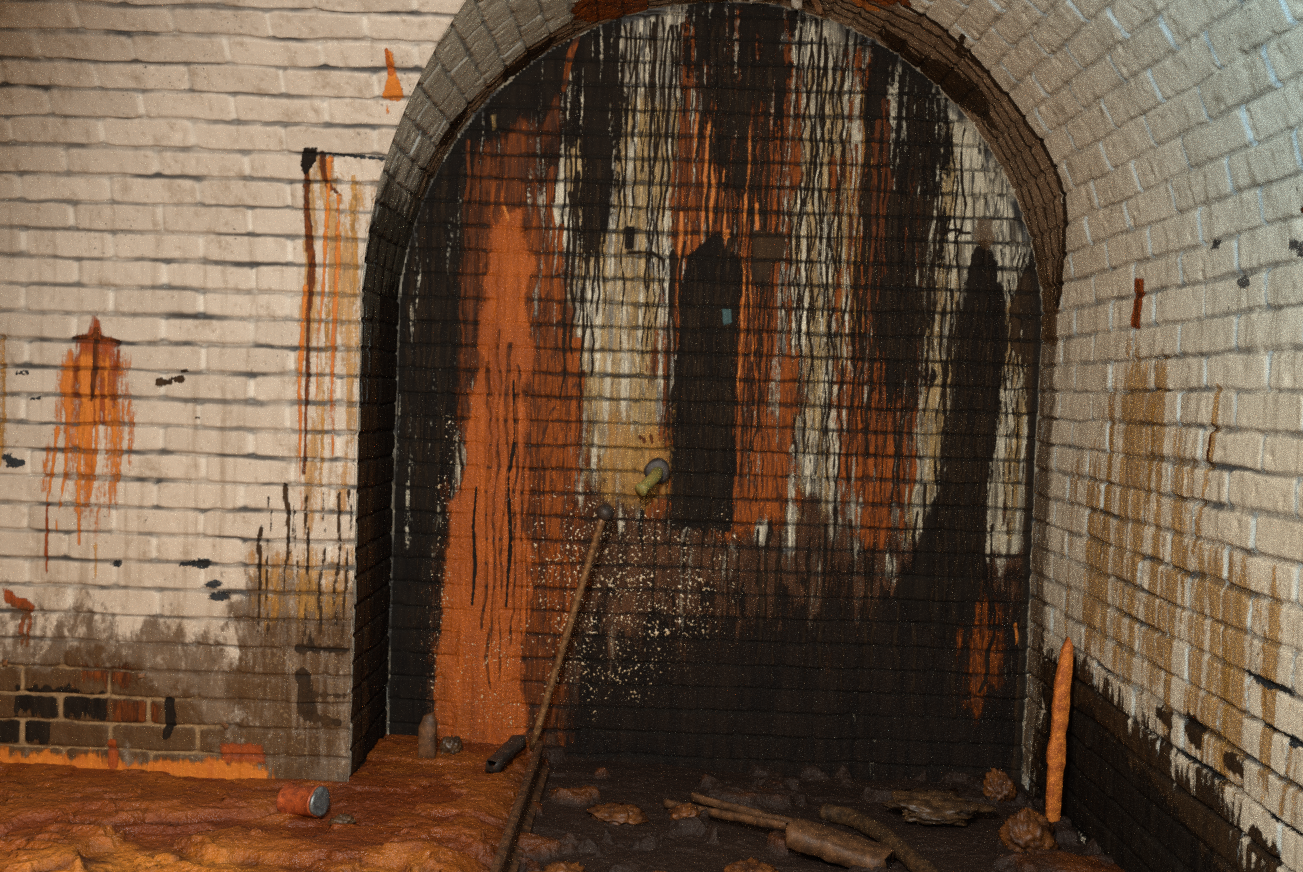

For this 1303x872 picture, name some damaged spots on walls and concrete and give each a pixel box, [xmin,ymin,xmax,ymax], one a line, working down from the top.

corrosion [43,316,135,576]
corrosion [296,147,385,531]
corrosion [382,48,404,112]
corrosion [428,0,809,746]
leakage [179,2,1061,808]
corrosion [828,46,929,552]
corrosion [952,222,1057,781]
leakage [1060,647,1283,872]
corrosion [1064,278,1301,826]
leakage [1243,668,1294,697]
leakage [1261,719,1303,749]
leakage [1288,239,1303,257]